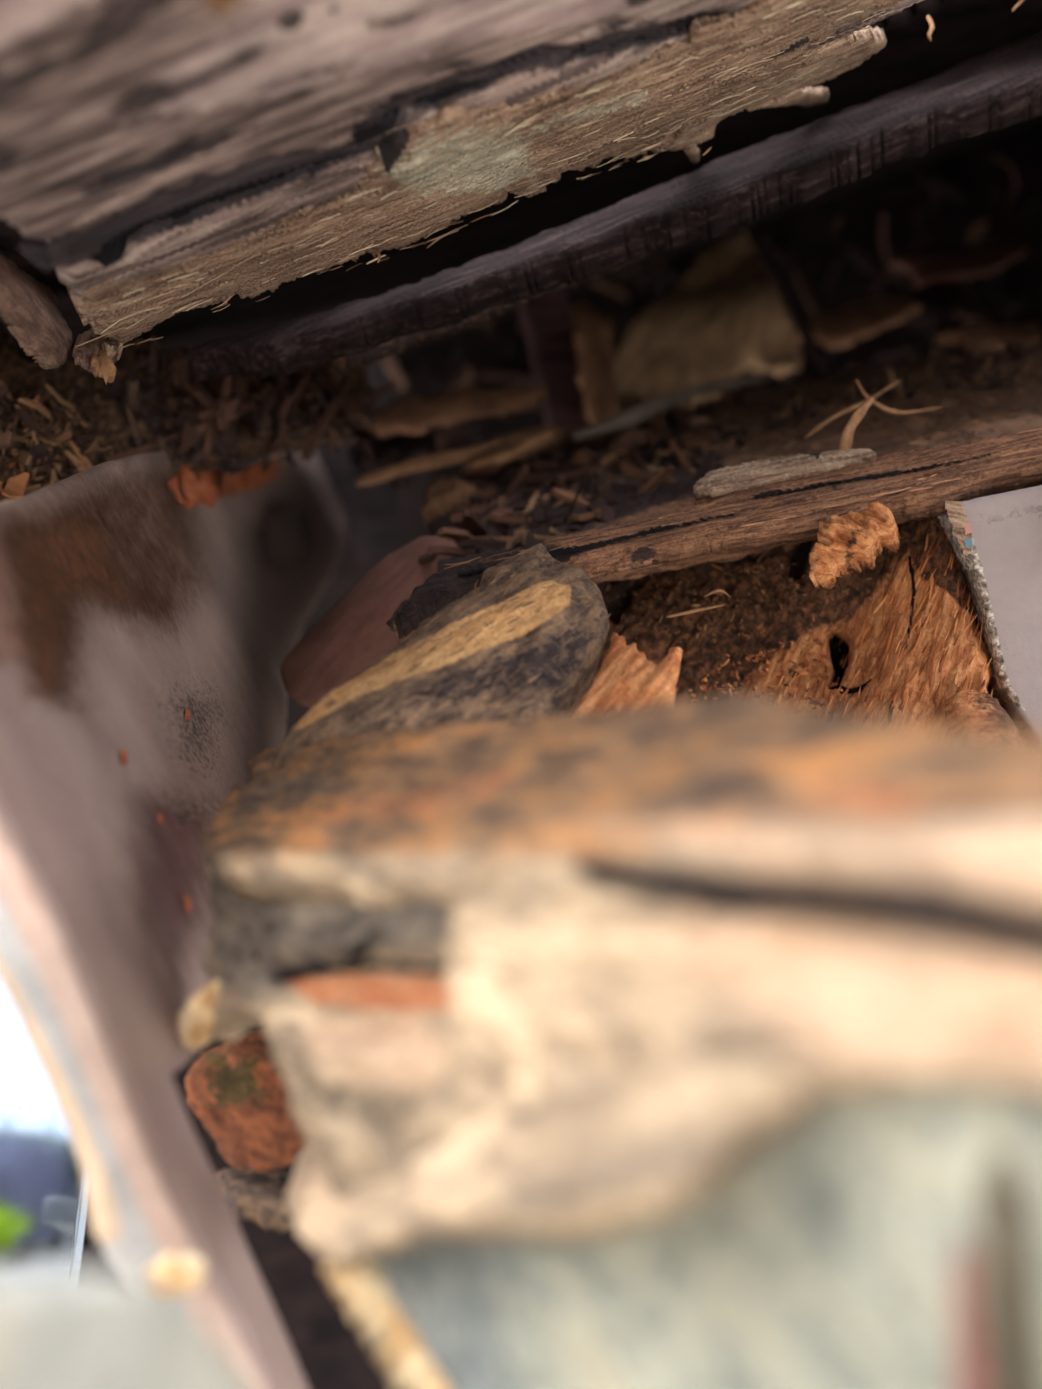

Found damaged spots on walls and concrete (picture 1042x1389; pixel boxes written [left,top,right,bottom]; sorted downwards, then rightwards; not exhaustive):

spalling [945,501,973,555]
crack [831,635,894,715]